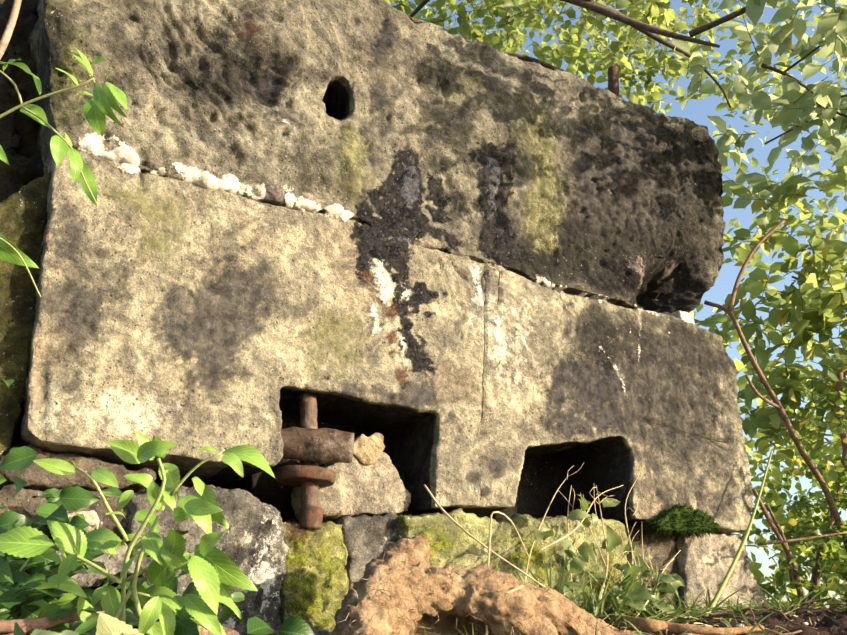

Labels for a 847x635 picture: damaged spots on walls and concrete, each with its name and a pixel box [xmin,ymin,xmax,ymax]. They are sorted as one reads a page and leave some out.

leakage [371,80,390,112]
leakage [470,106,567,274]
leakage [336,115,465,376]
leakage [469,265,485,309]
leakage [490,317,508,358]